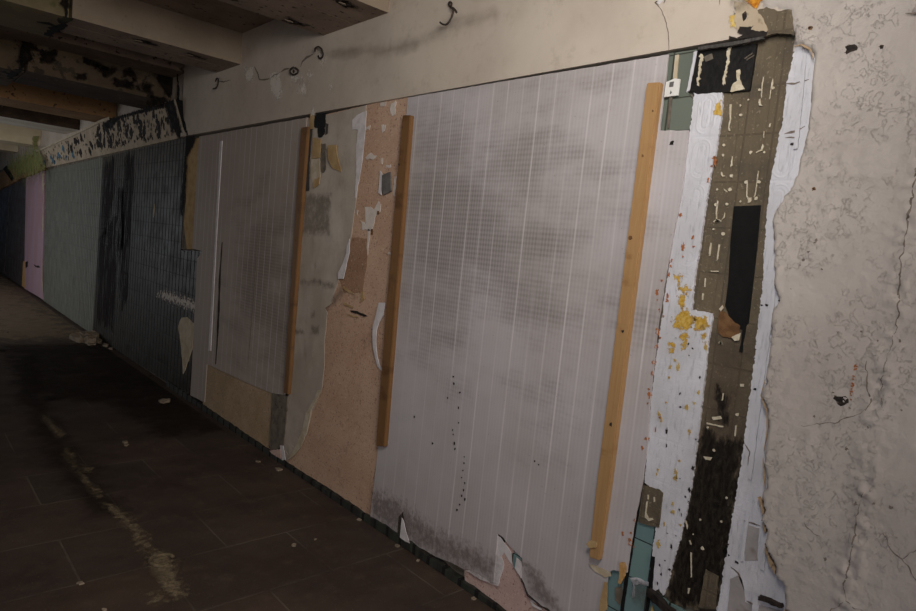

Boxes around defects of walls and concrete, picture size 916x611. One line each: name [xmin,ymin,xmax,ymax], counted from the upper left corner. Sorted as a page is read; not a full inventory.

crack [6,0,74,79]
peeling [729,1,768,40]
damp [73,57,173,108]
peeling [44,99,183,165]
damp [96,149,135,330]
peeling [342,286,385,371]
peeling [753,381,776,574]
peeling [758,595,787,611]